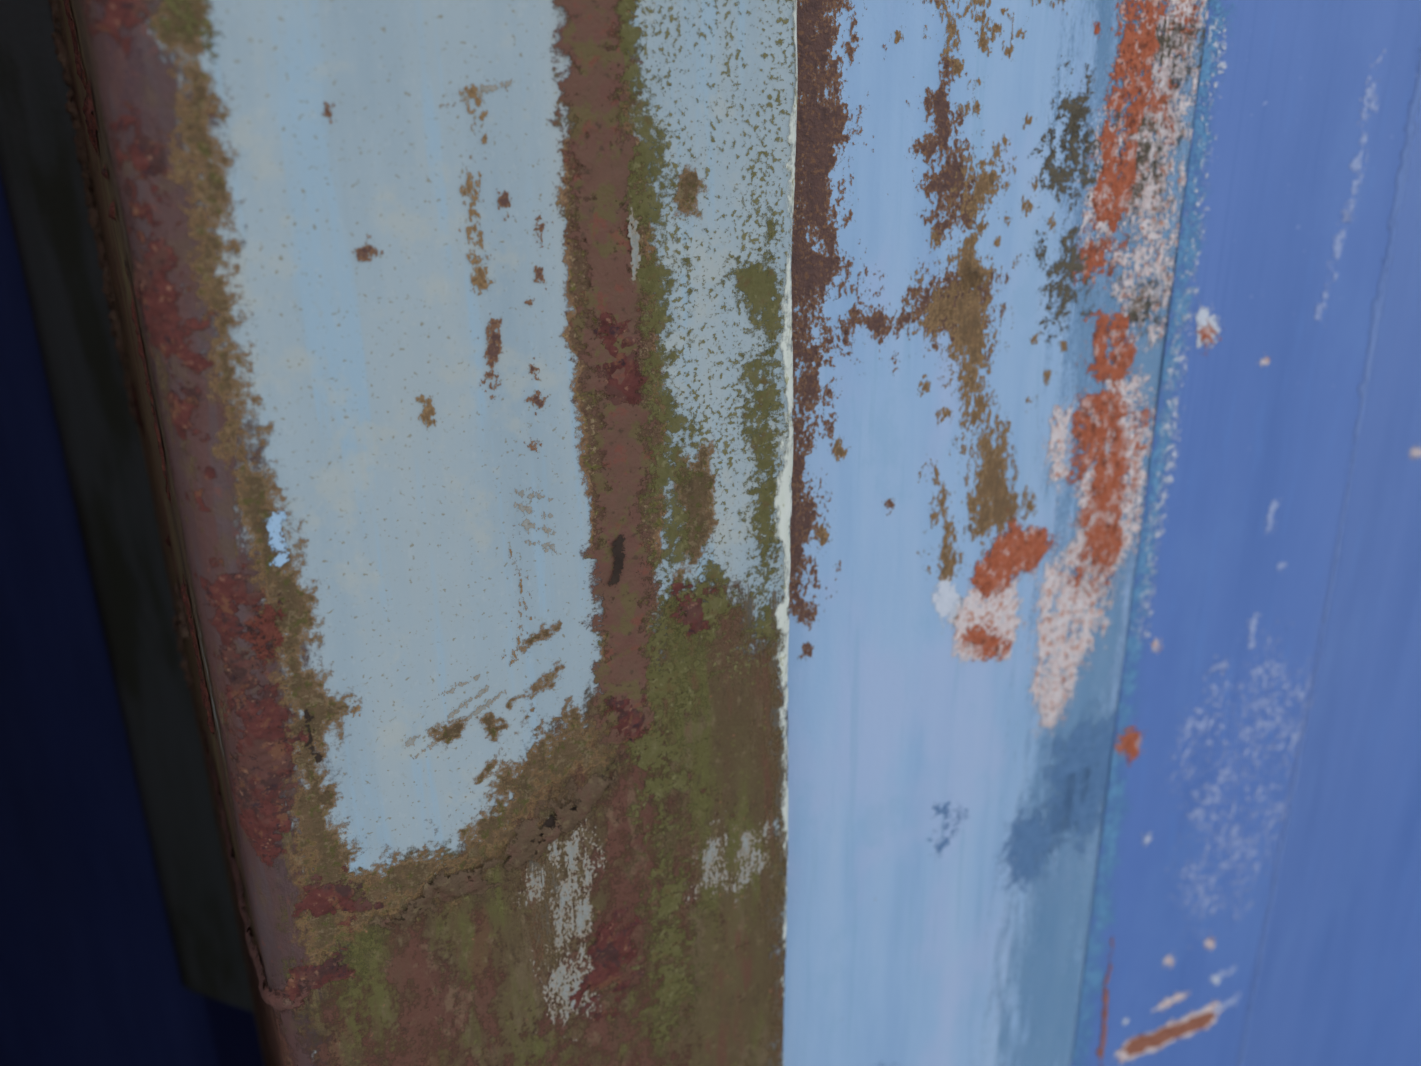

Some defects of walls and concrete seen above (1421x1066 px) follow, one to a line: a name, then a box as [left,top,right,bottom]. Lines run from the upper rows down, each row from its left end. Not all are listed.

corrosion [80,0,1038,1066]
peeling [774,255,794,947]
peeling [786,0,798,223]
peeling [930,0,1209,742]
peeling [1113,719,1147,769]
corrosion [1121,1011,1216,1057]